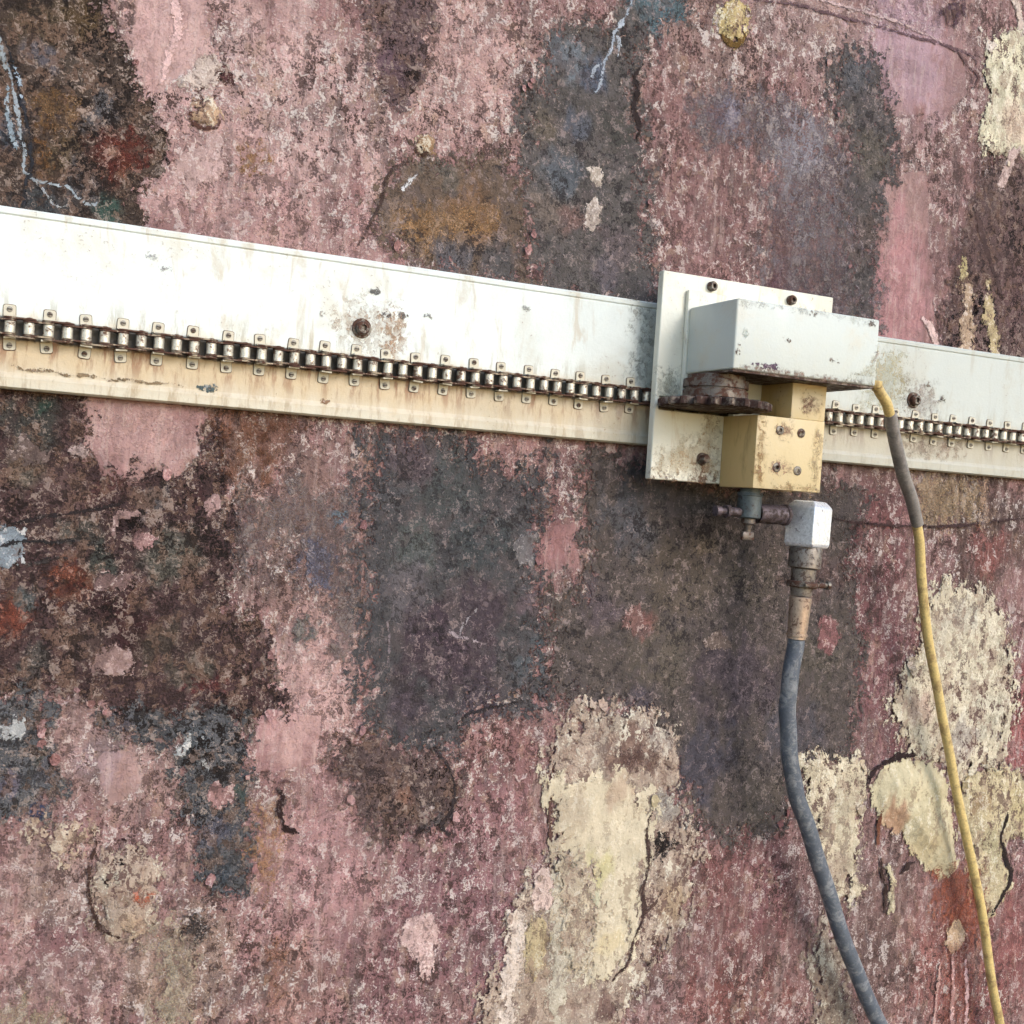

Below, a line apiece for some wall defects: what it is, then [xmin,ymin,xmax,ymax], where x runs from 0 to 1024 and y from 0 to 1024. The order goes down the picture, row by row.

rust [393,196,501,252]
leakage [513,530,540,567]
peeling [319,421,881,864]
peeling [0,389,296,953]
crack [275,779,300,834]
crack [546,801,554,842]
peeling [531,865,556,911]
crack [612,809,663,981]
crack [991,812,1014,916]